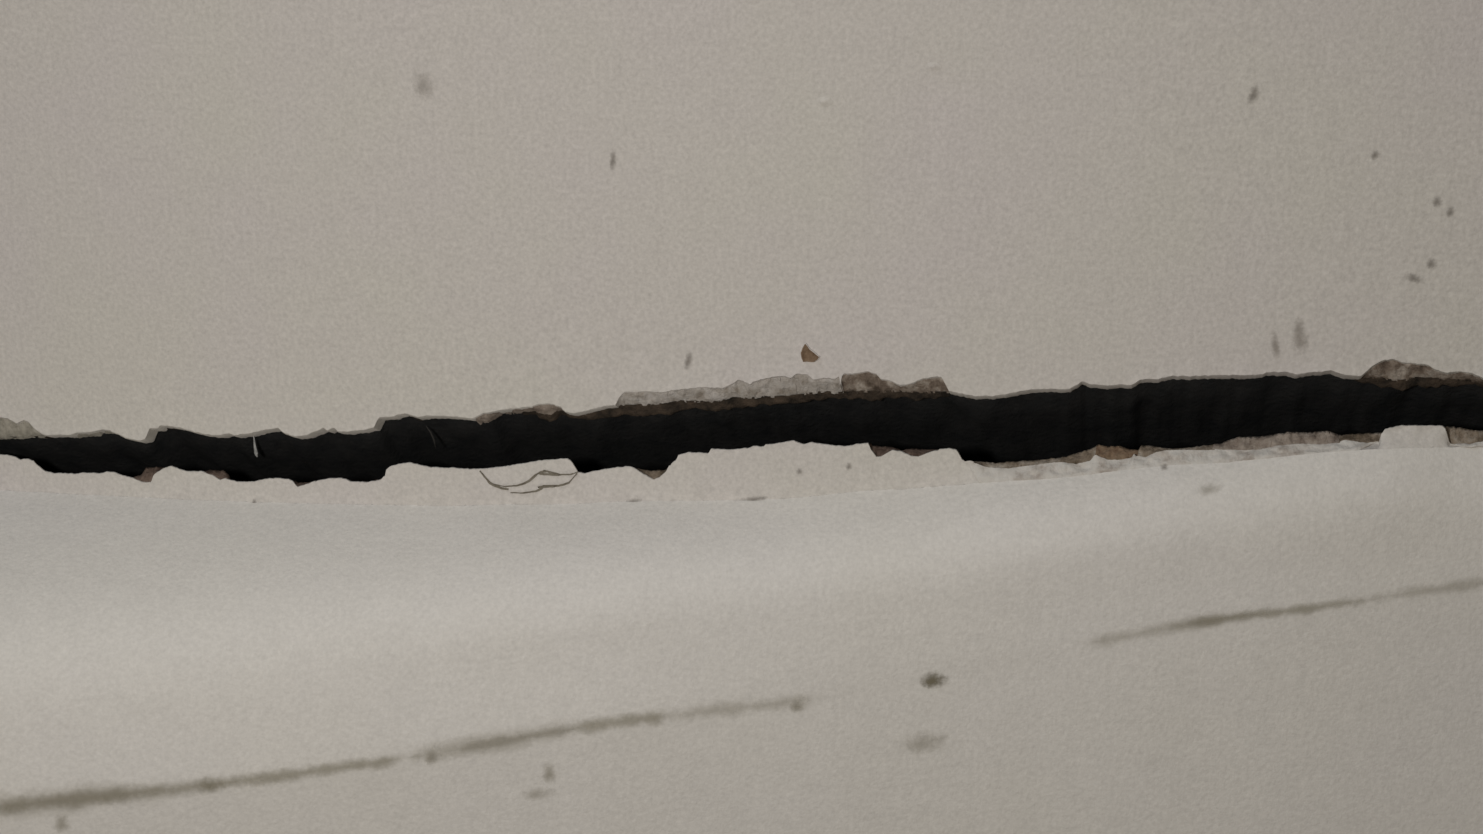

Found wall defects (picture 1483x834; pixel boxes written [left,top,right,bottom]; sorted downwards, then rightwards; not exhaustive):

crack [0,360,1483,506]